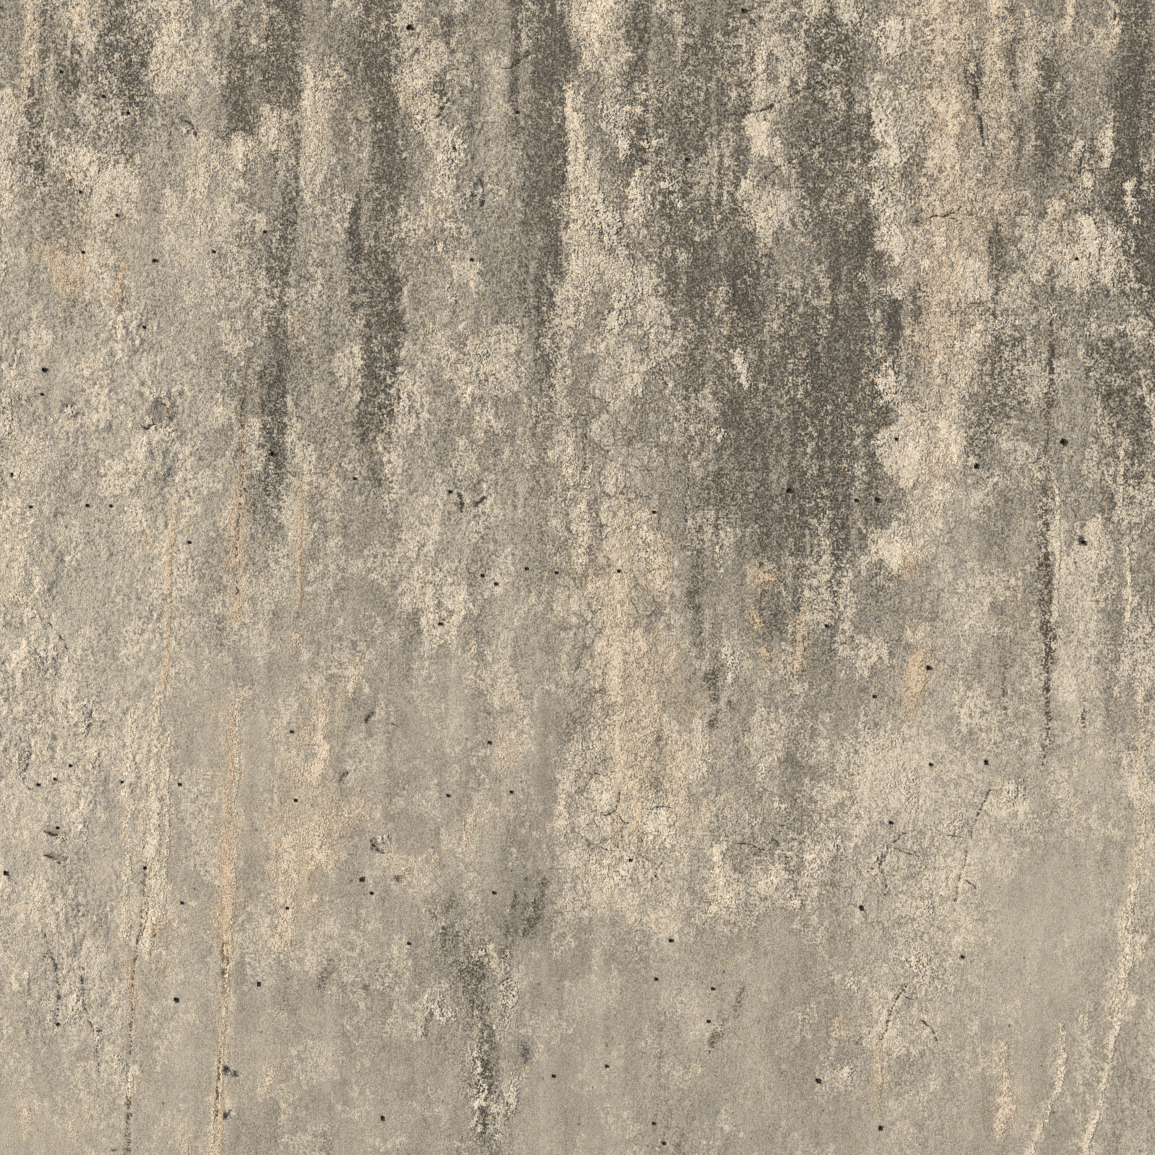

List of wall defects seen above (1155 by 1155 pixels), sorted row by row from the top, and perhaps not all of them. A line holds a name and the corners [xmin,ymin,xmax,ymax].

water stain [441,15,454,54]
water stain [184,0,346,519]
water stain [346,0,415,446]
water stain [509,0,1026,645]
water stain [1036,0,1155,329]
crack [42,865,156,1155]
crack [214,1052,222,1117]
crack [221,939,229,992]
water stain [472,1004,511,1125]
water stain [502,879,546,957]
crack [867,830,919,901]
crack [947,785,992,915]